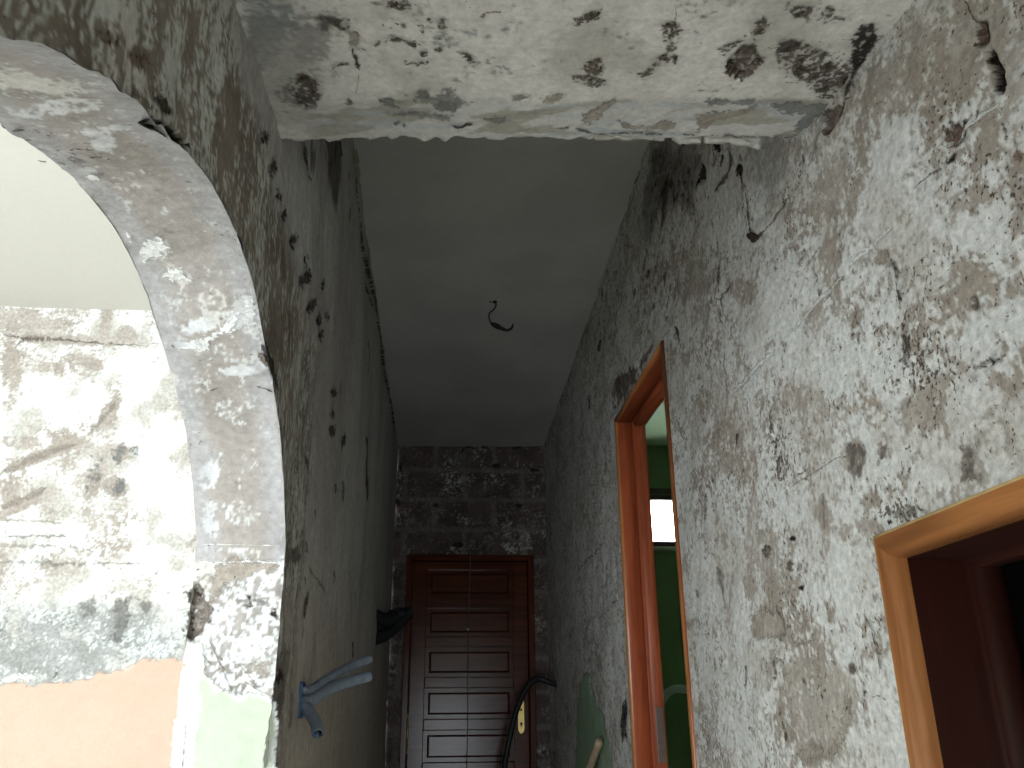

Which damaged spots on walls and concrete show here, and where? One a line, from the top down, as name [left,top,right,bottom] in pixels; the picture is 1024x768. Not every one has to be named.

water stain [315,16,348,30]
flaking render [965,1,1007,92]
peeling [0,544,301,768]
peeling [575,672,627,768]